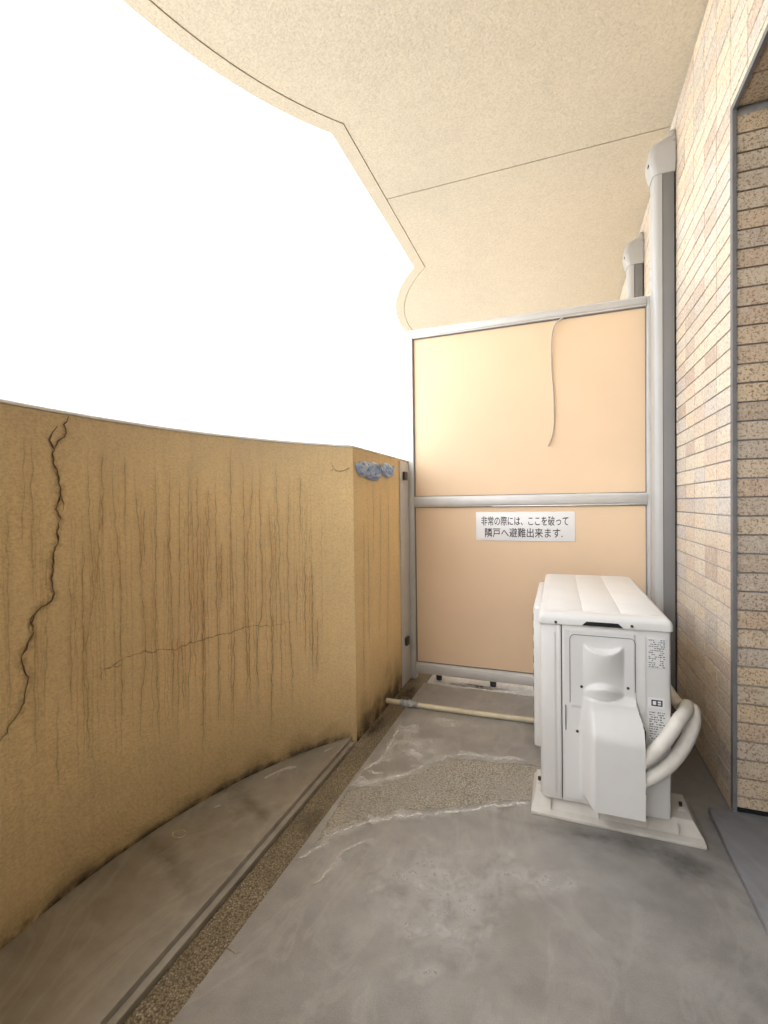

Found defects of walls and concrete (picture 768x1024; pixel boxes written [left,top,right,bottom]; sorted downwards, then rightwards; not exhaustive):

crack [0,416,69,741]